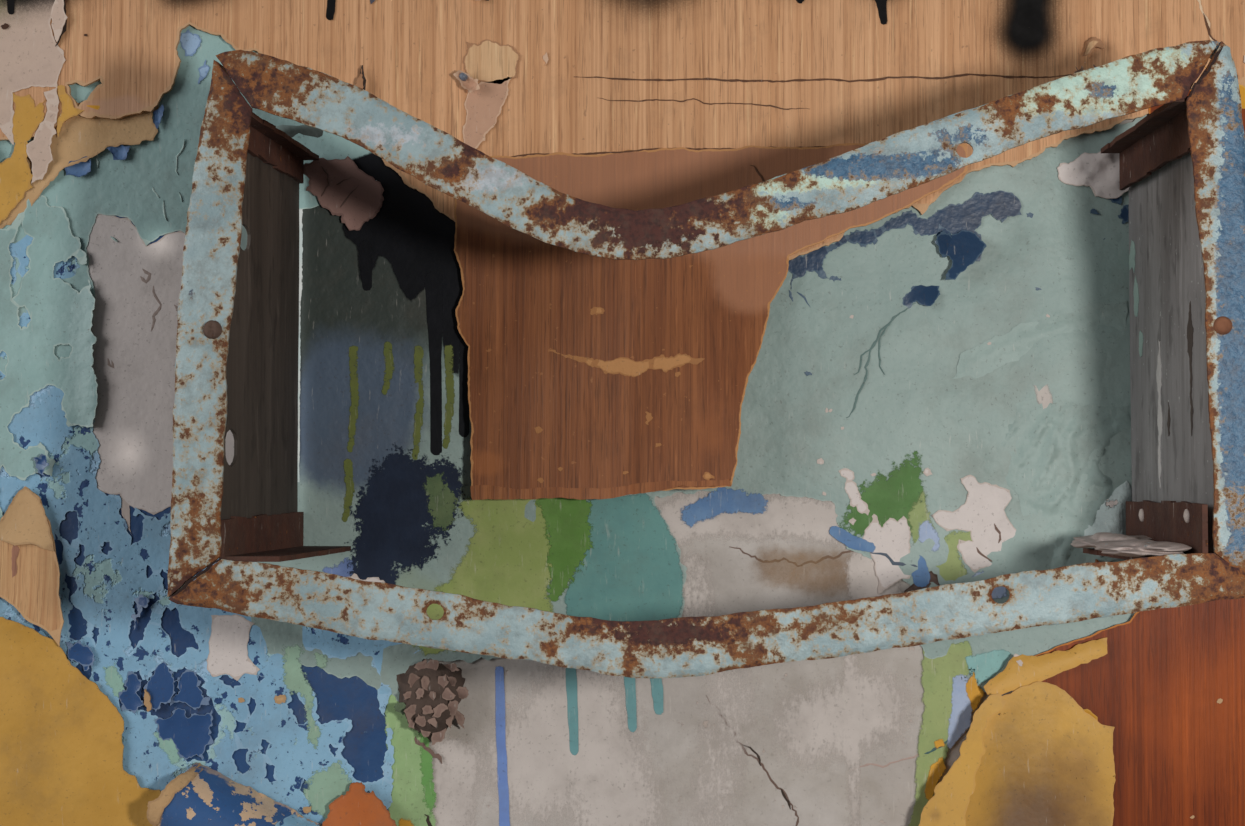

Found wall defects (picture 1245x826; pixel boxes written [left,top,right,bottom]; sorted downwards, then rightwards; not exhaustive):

crack [1197,0,1217,41]
peeling [462,39,520,149]
crack [576,73,1072,110]
peeling [65,156,91,177]
peeling [788,190,1033,309]
crack [846,303,915,418]
flaking render [0,195,185,671]
flaking render [225,430,234,465]
flaking render [839,468,940,594]
flaking render [931,475,1016,573]
flaking render [119,614,260,760]
crack [706,695,799,826]